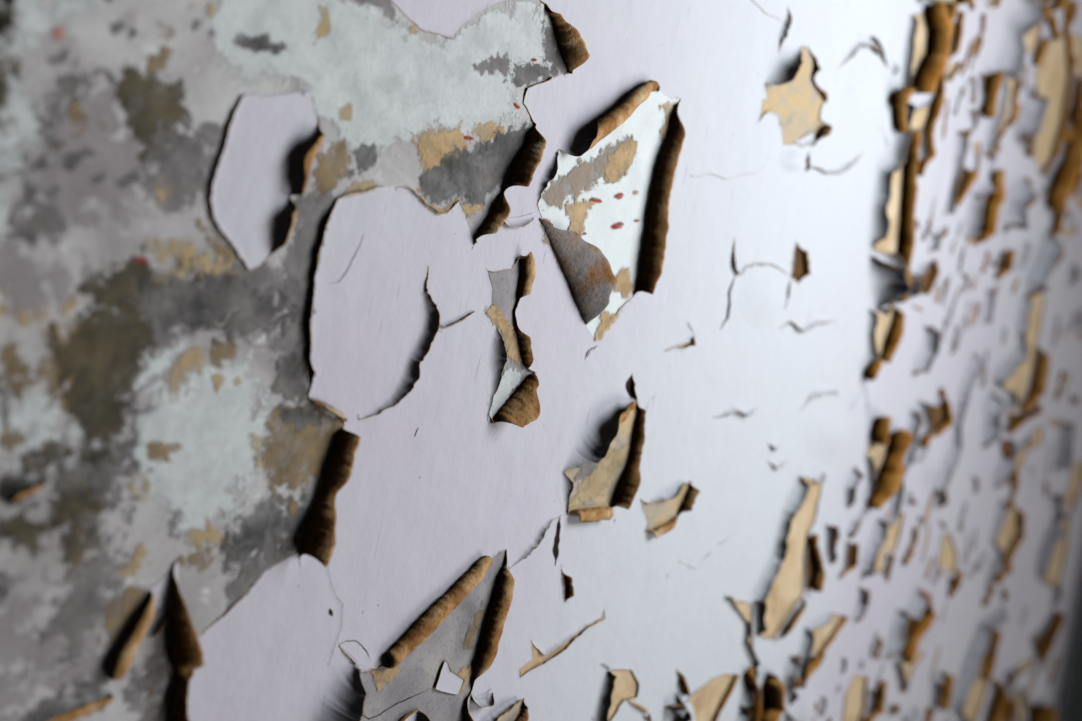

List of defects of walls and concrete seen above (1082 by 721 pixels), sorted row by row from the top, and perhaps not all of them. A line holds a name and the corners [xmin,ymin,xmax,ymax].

flaking render [0,0,700,721]
peeling [584,0,1082,721]